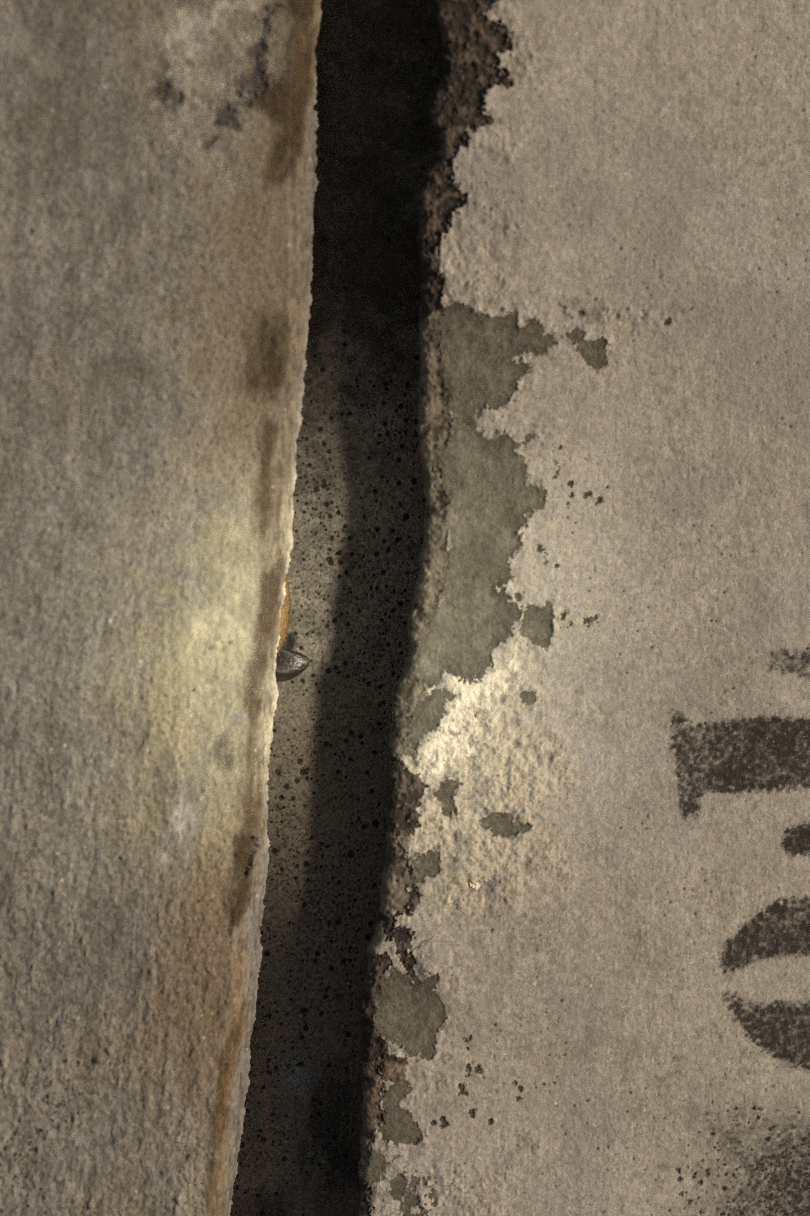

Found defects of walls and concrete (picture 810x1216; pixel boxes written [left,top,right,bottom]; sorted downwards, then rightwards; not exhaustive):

rust [254,0,314,179]
rust [248,322,288,390]
rust [258,421,276,532]
rust [244,558,283,725]
peeling [358,0,610,1216]
rust [230,754,259,923]
rust [208,1025,240,1204]